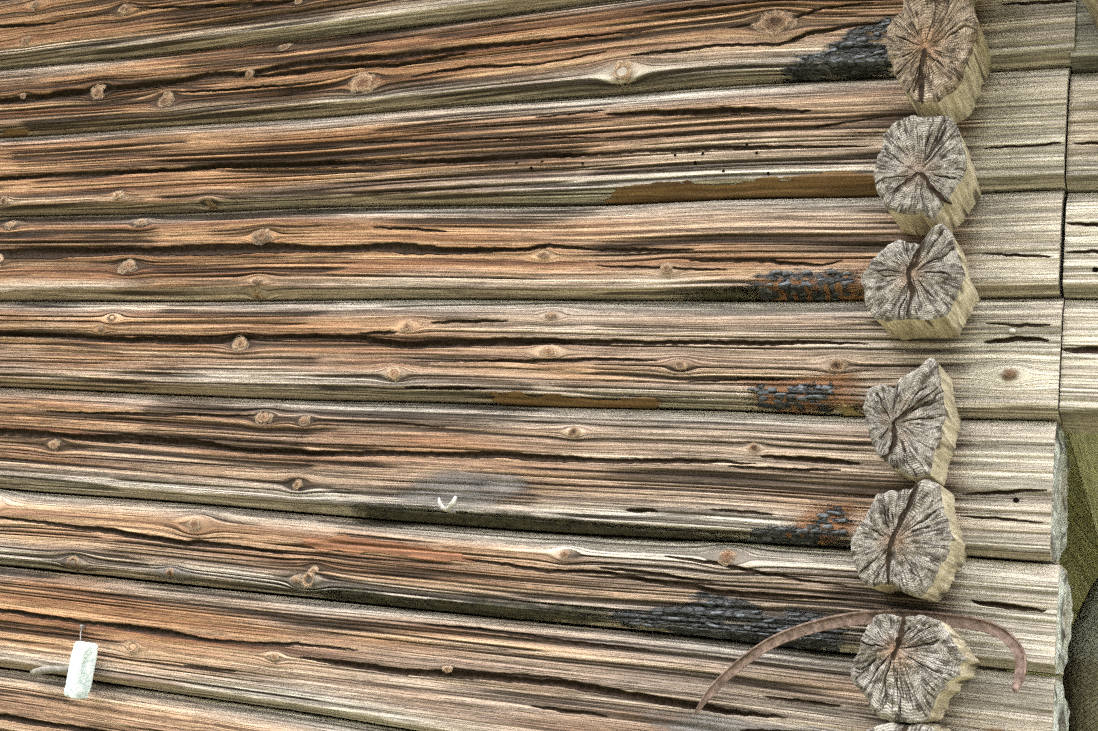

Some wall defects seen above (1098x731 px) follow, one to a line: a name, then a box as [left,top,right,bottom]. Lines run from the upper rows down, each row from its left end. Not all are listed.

crack [917,47,927,105]
crack [893,171,952,205]
crack [906,239,925,315]
crack [0,319,867,390]
crack [0,387,939,471]
crack [626,506,657,514]
crack [710,508,773,516]
crack [886,483,918,585]
crack [0,609,840,731]
crack [891,616,906,660]